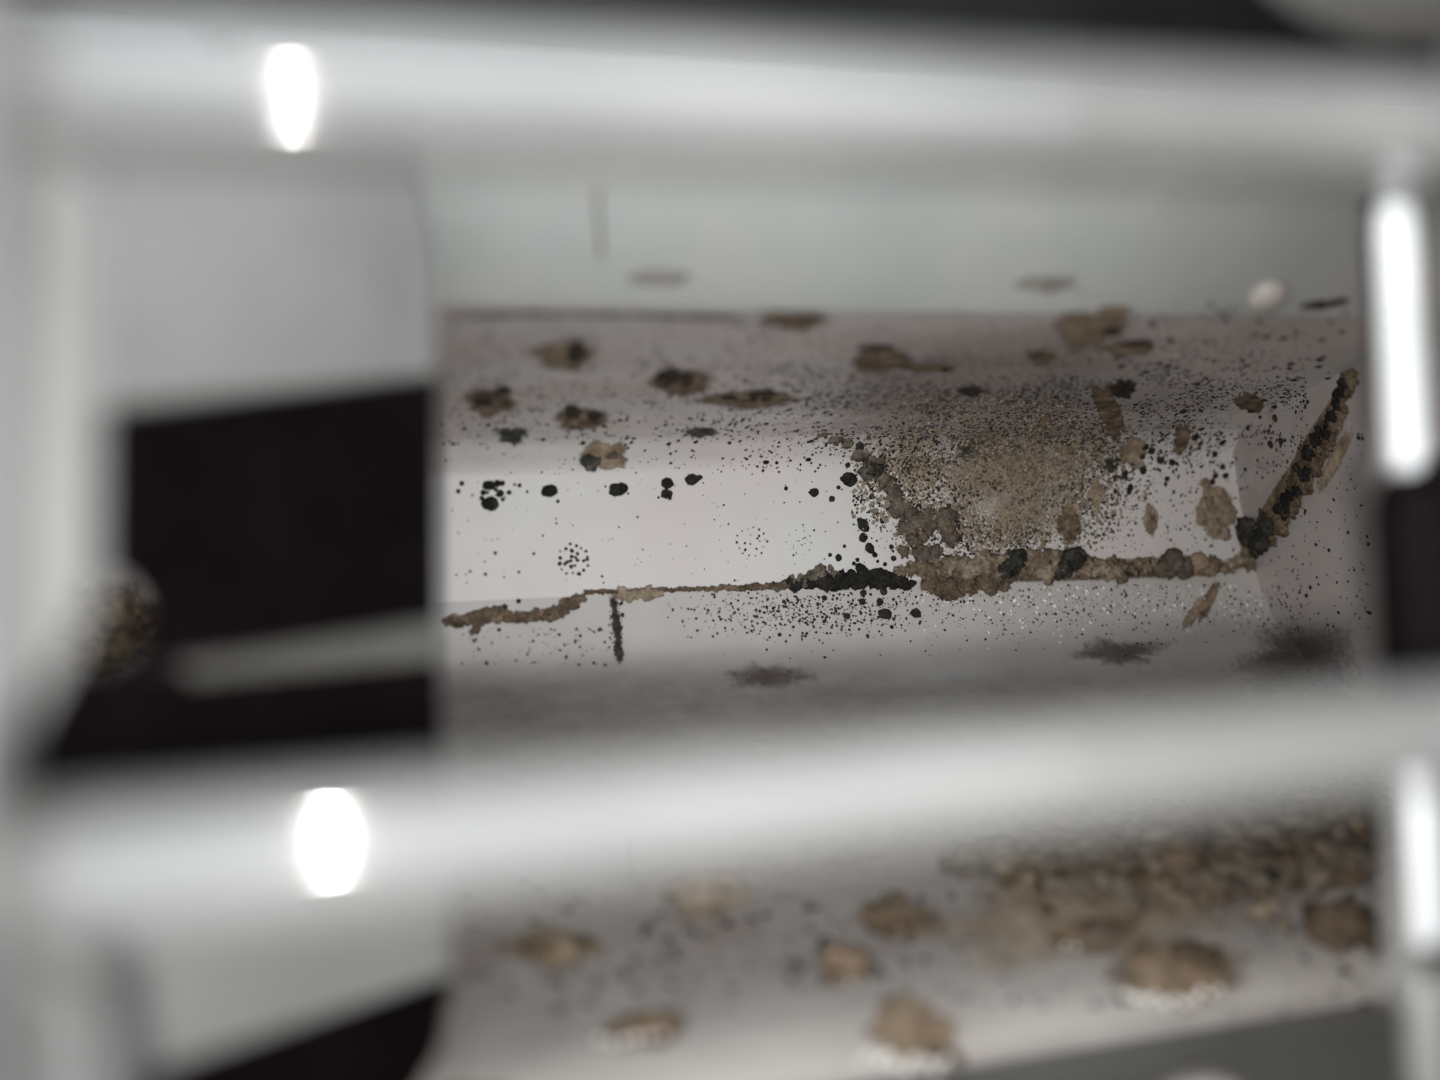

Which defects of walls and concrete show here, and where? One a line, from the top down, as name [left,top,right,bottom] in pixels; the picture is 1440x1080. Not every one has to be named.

damp [1014,276,1082,294]
damp [439,296,1371,684]
crack [608,596,624,662]